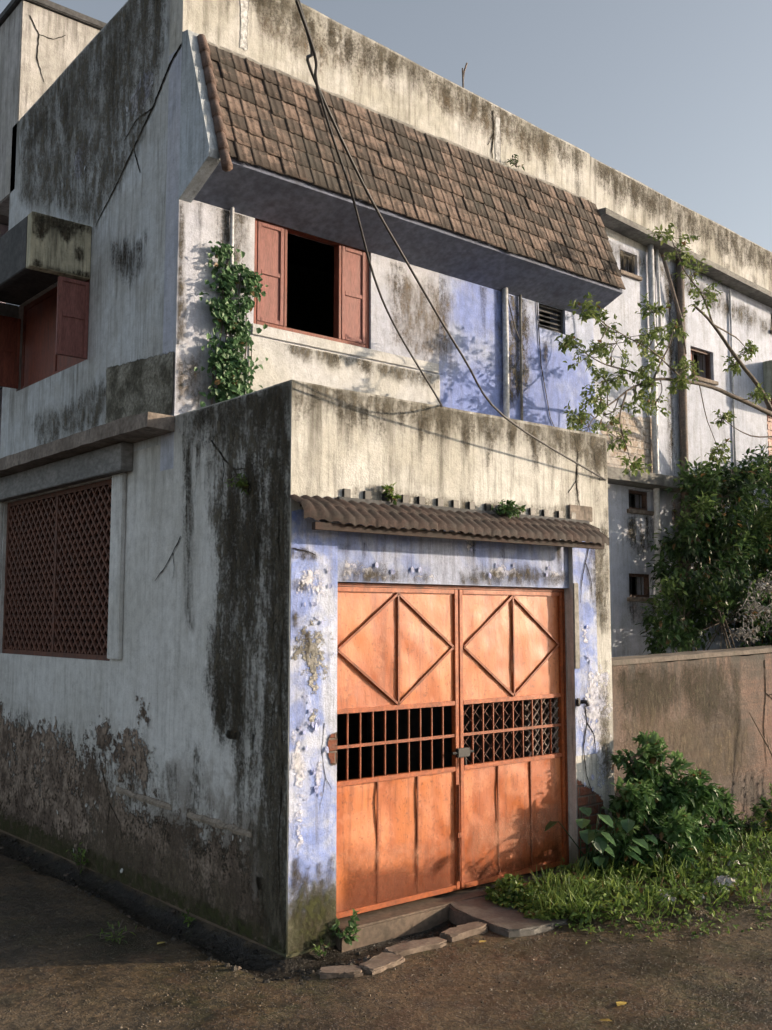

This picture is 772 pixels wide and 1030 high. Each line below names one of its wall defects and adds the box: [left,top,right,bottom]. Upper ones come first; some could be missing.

crack [29,15,66,81]
leakage [595,163,772,283]
leakage [285,344,439,387]
leakage [394,266,450,354]
leakage [498,295,531,403]
leakage [612,248,772,378]
leakage [301,383,606,481]
flaking render [601,410,660,473]
leakage [0,360,336,953]
peeling [290,567,337,851]
peeling [0,695,275,941]